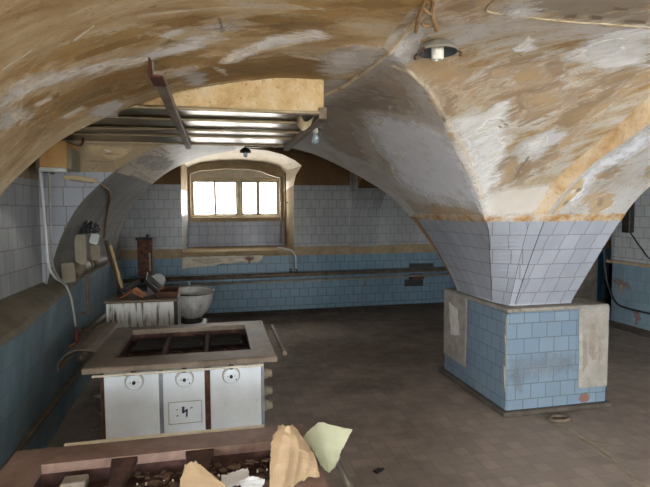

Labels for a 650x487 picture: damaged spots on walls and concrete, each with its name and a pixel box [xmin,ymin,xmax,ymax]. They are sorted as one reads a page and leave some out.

flaking render [512,38,537,52]
flaking render [564,27,650,70]
peeling [0,20,241,130]
flaking render [365,101,568,215]
flaking render [554,136,647,213]
peeling [182,255,263,269]
peeling [449,302,460,336]